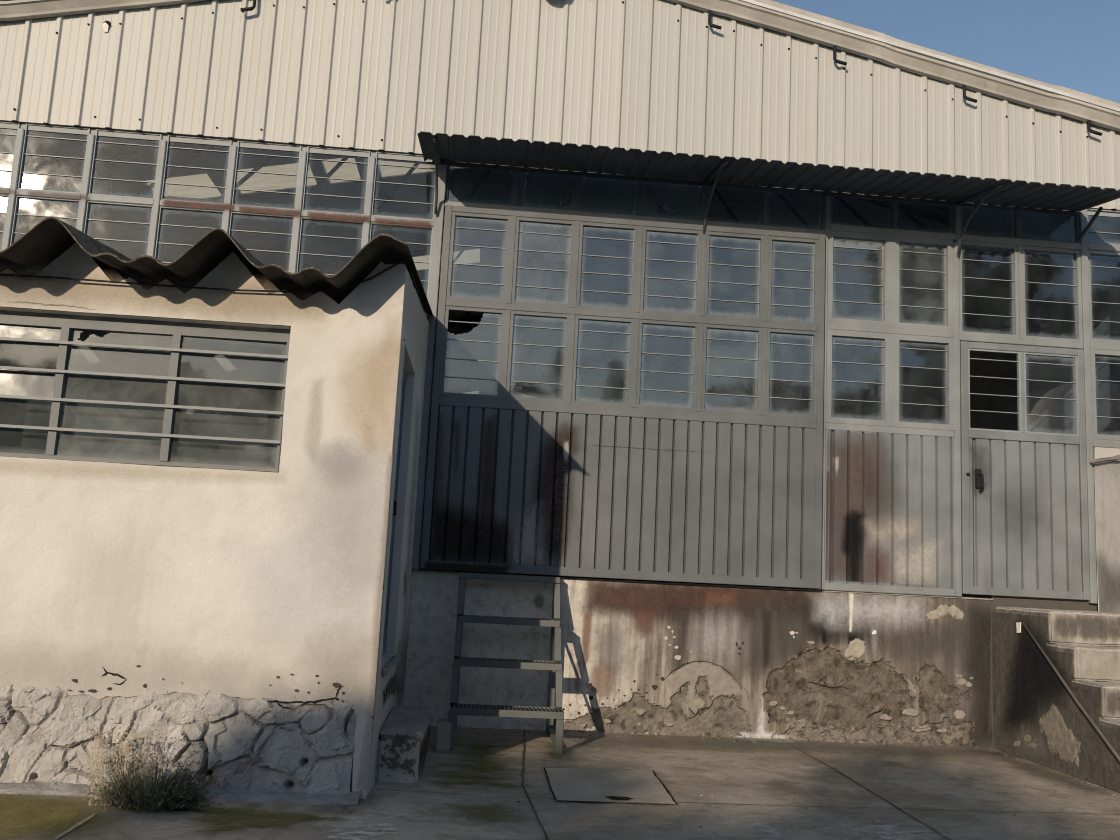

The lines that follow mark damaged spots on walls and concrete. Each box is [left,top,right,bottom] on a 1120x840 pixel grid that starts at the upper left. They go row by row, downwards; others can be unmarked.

crack [244,685,352,709]
flaking render [553,674,752,738]
rust [576,582,816,690]
flaking render [763,631,975,746]